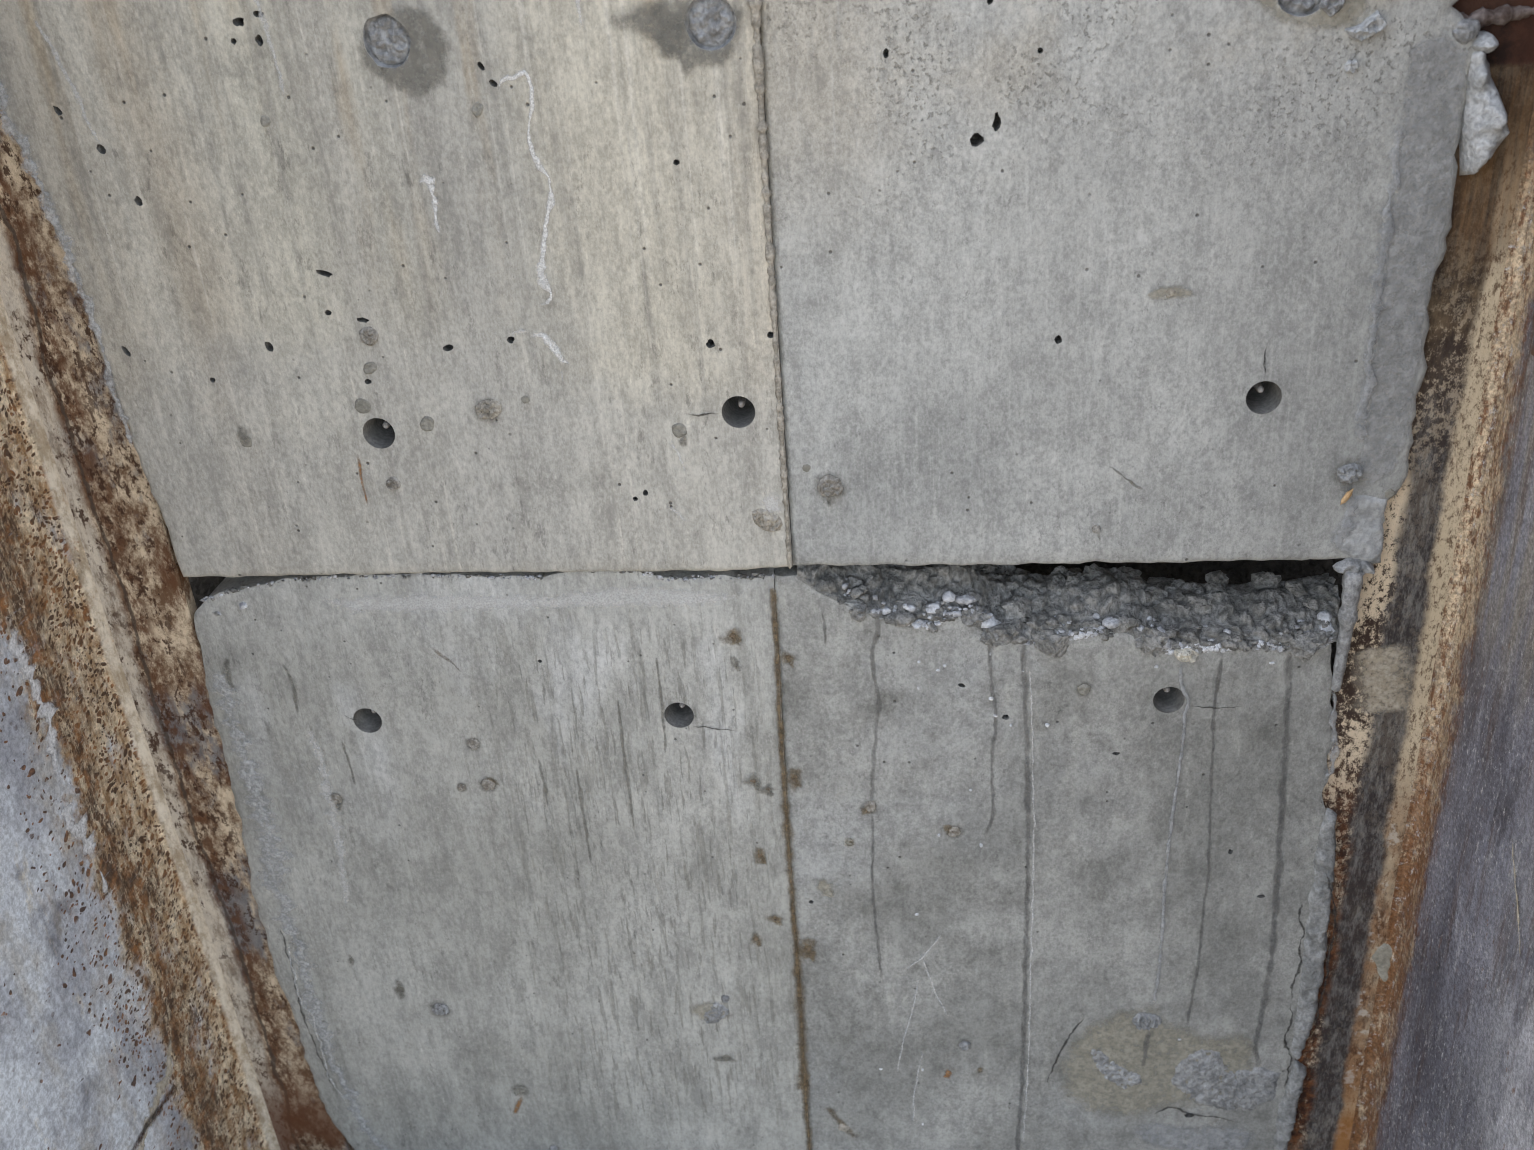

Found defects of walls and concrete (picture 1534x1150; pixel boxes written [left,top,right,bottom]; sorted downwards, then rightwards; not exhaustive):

peeling [1318,0,1387,42]
leakage [871,611,962,678]
leakage [1057,627,1114,641]
peeling [1174,647,1199,663]
leakage [986,632,997,826]
leakage [1161,639,1291,784]
corrosion [746,769,801,796]
leakage [1266,691,1290,985]
leakage [1011,634,1036,1150]